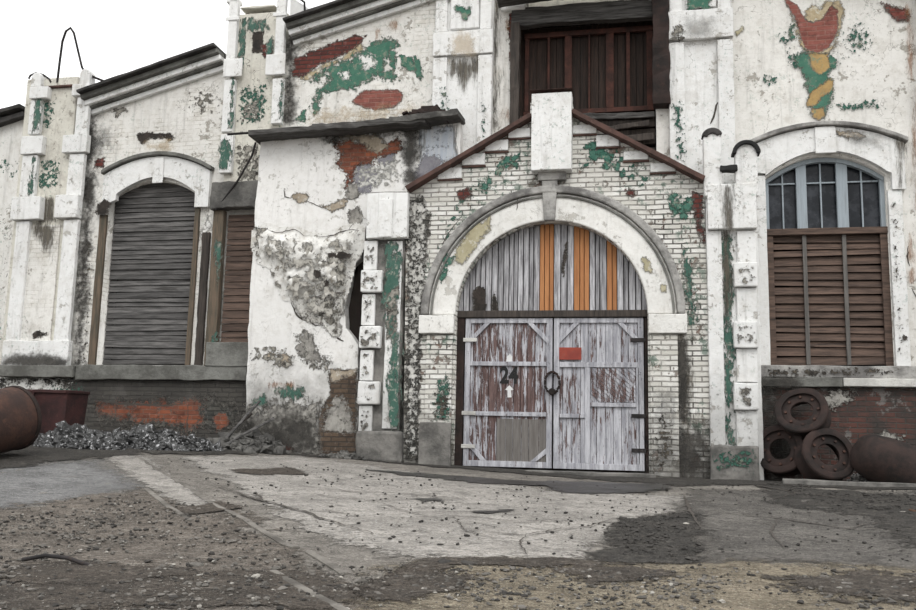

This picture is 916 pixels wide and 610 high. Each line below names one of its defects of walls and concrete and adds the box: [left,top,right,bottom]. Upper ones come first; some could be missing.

flaking render [785,0,839,53]
flaking render [291,34,424,81]
damp [450,59,478,91]
spalling [188,77,259,129]
flaking render [352,89,404,111]
peeling [806,77,834,121]
peeling [836,99,886,112]
damp [33,196,56,252]
peeling [253,136,404,342]
flaking render [94,194,432,462]
spalling [430,388,453,421]
flaking render [824,387,859,412]